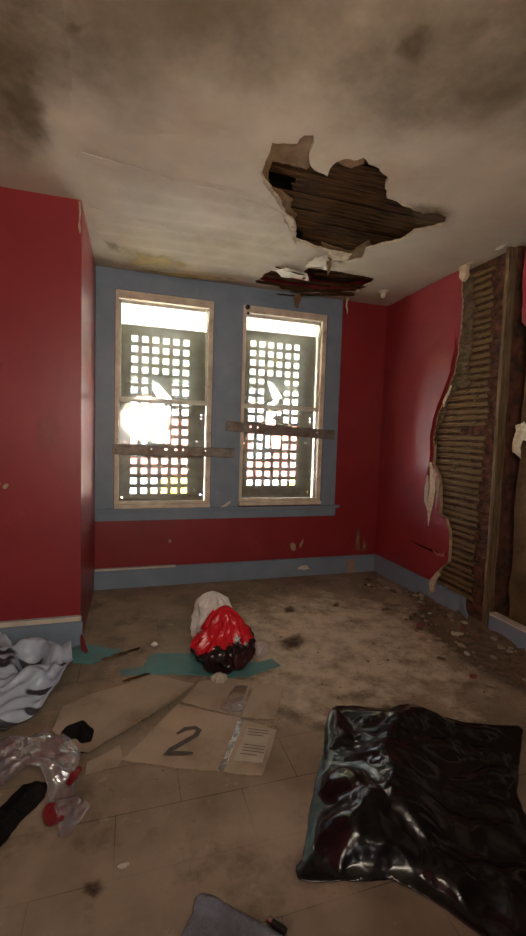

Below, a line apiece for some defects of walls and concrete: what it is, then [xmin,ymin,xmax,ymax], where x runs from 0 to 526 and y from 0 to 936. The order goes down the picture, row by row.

flaking render [424,264,496,602]
spalling [508,375,526,626]